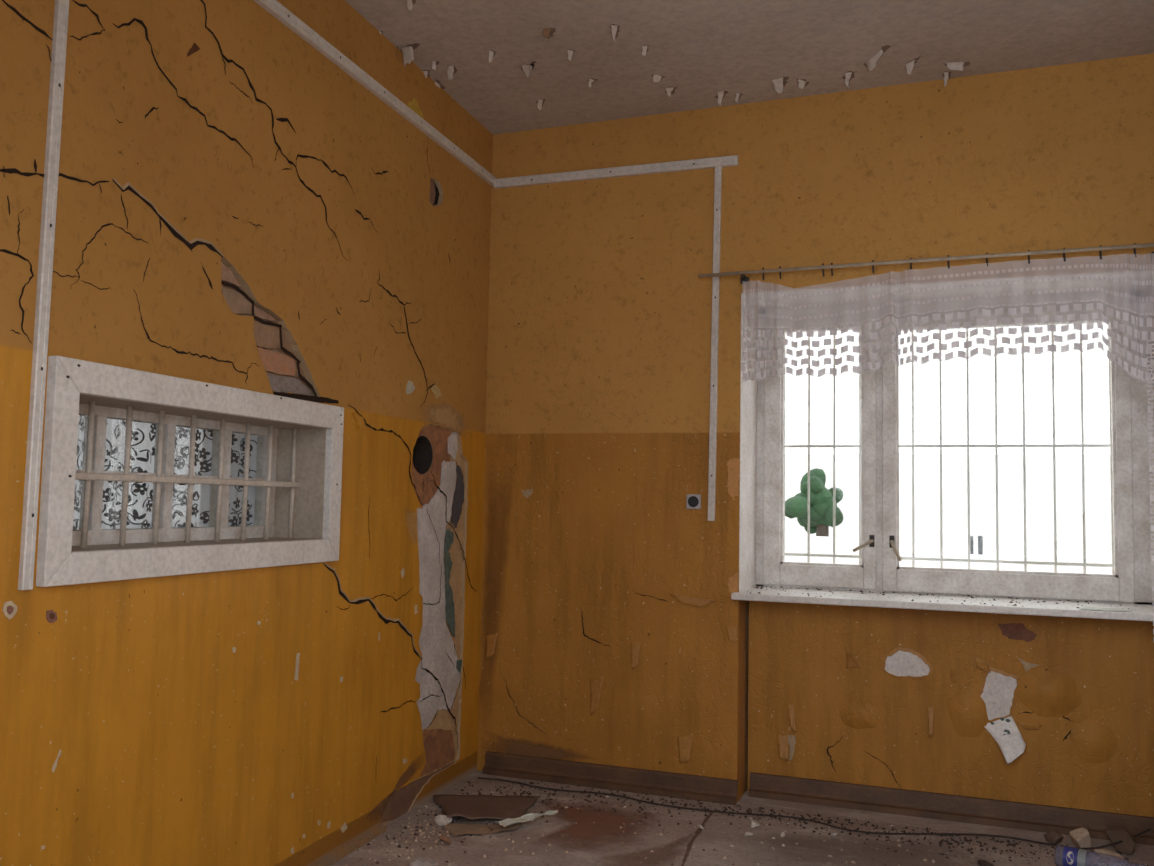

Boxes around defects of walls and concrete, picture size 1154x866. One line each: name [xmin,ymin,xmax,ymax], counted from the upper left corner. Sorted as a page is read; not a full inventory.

peeling [395,43,458,89]
peeling [942,62,970,87]
crack [2,0,388,261]
flaking render [429,178,443,206]
crack [0,159,258,384]
flaking render [221,257,339,404]
crack [298,273,435,407]
crack [349,405,423,508]
crack [324,563,423,660]
flaking render [380,424,468,825]
flaking render [881,647,933,681]
flaking render [971,652,1038,723]